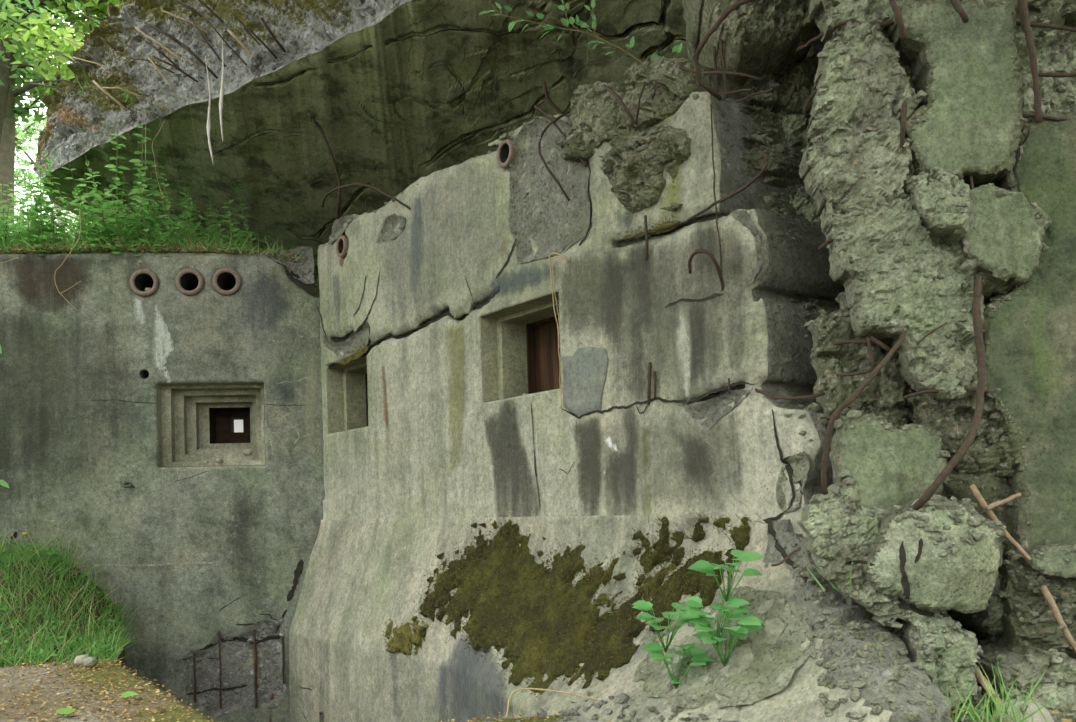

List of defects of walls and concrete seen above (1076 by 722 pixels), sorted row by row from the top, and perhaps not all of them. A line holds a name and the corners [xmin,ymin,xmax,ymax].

crack [246,0,686,90]
spalling [603,79,657,125]
spalling [622,0,774,291]
peeling [959,183,1052,287]
crack [268,239,516,488]
water stain [677,306,715,395]
water stain [485,401,537,517]
crack [531,408,574,506]
water stain [575,409,636,512]
crack [562,381,808,583]
spalling [183,615,286,718]
water stain [439,640,506,722]